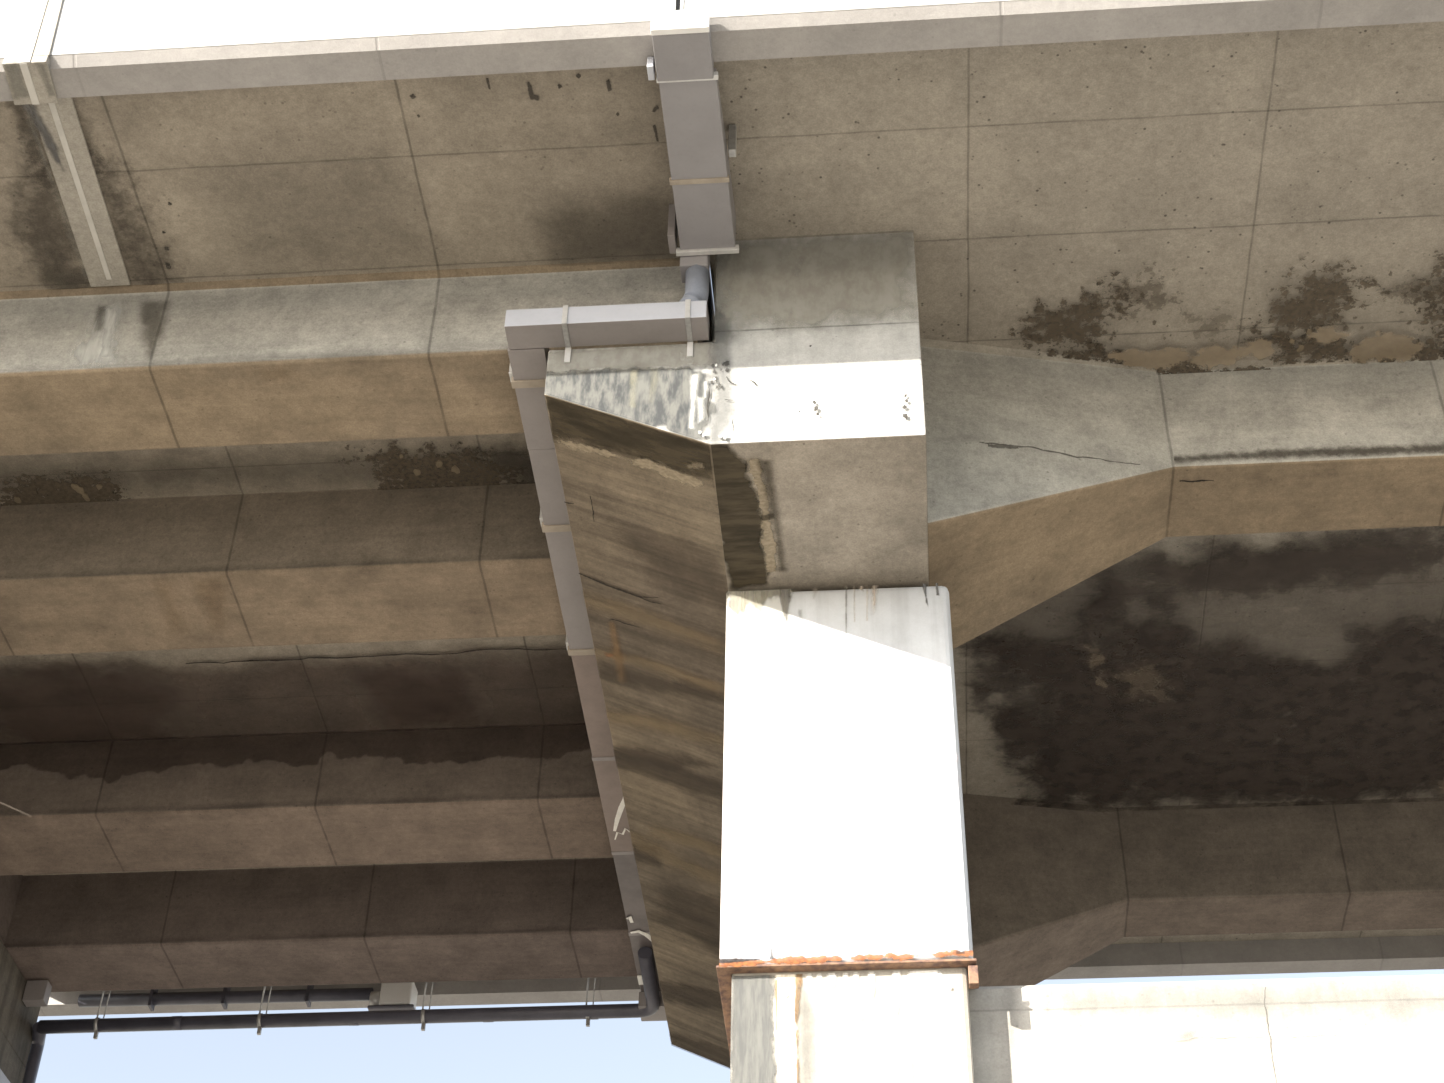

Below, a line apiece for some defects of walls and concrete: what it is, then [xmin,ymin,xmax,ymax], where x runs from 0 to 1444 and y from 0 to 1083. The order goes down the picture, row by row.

damp [11,104,60,163]
damp [14,172,87,282]
damp [75,306,120,365]
peeling [1009,250,1444,375]
peeling [0,470,131,506]
peeling [339,439,535,490]
damp [544,342,792,620]
crack [979,442,1140,465]
damp [0,653,586,745]
damp [961,531,1444,808]
damp [614,748,723,797]
damp [908,970,952,1083]